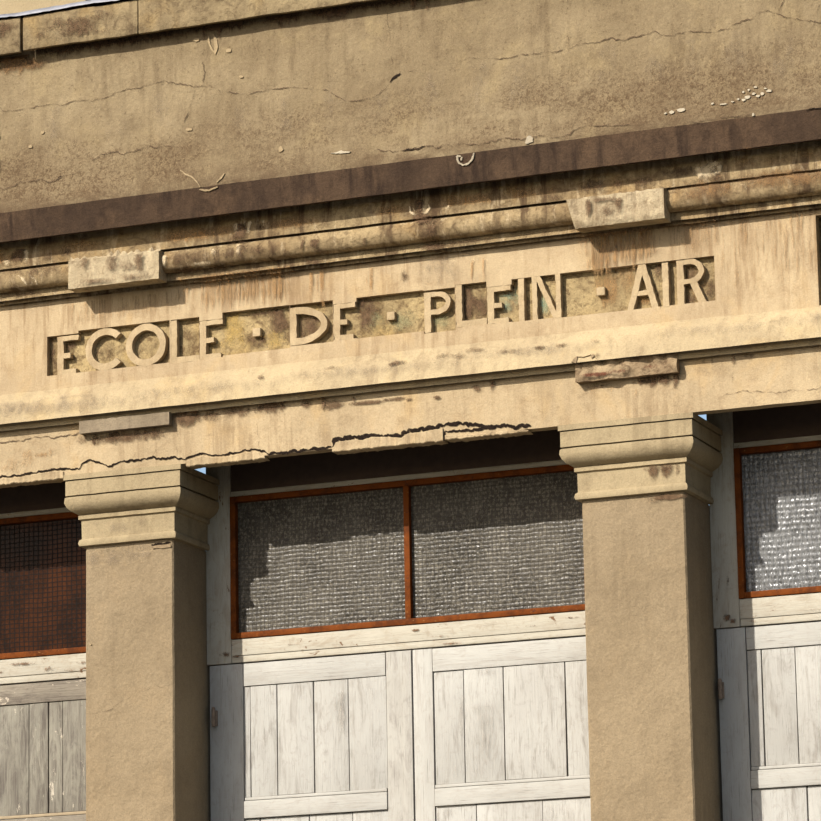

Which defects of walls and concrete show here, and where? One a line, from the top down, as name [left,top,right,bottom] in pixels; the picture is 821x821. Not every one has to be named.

crack [473,2,821,60]
flaking render [711,86,772,105]
crack [374,144,442,152]
crack [466,124,629,145]
crack [3,145,171,190]
damp [80,430,162,444]
crack [0,421,531,478]
flaking render [332,428,533,455]